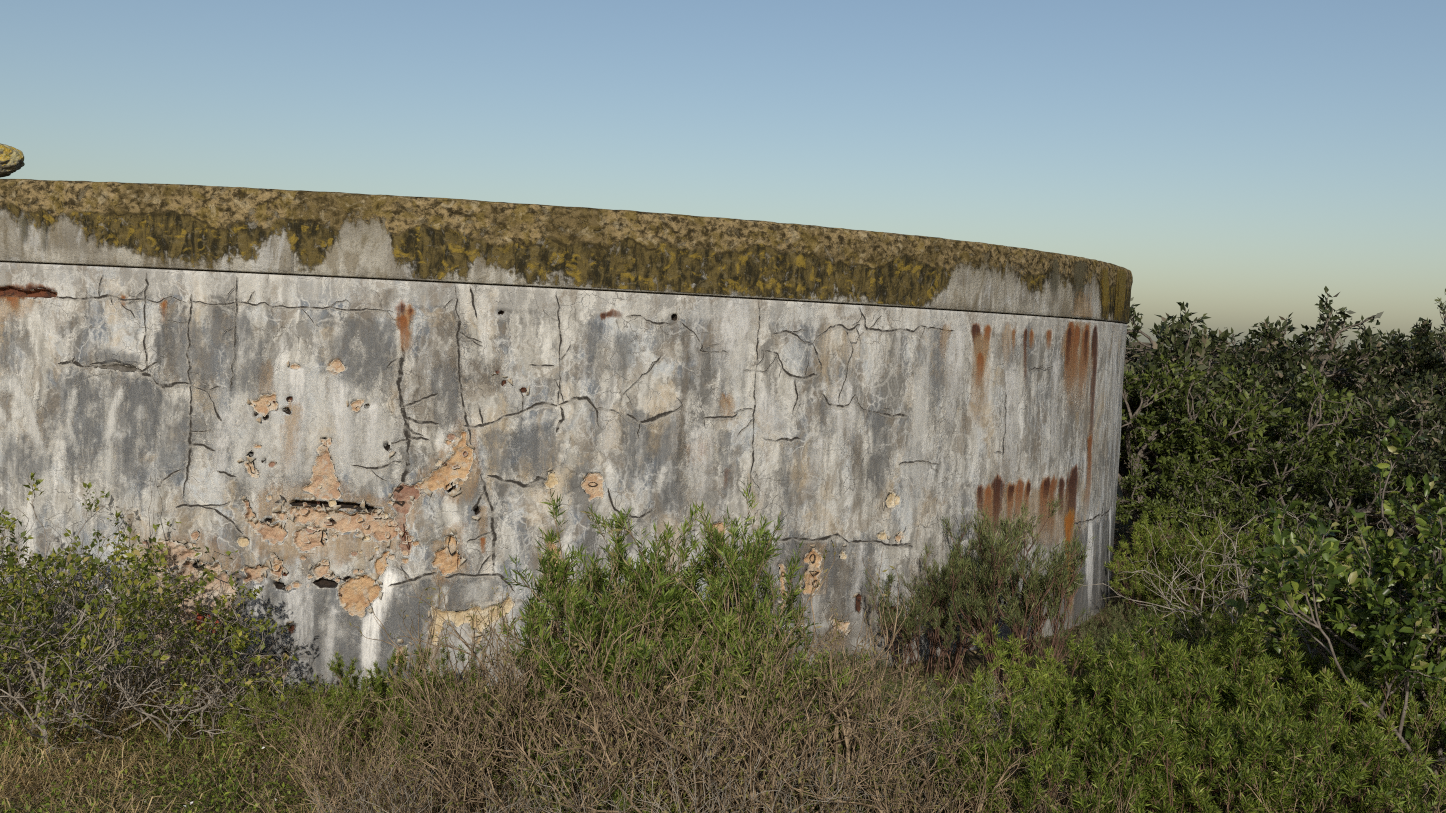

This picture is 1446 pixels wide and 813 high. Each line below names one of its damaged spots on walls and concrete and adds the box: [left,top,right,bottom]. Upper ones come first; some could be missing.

corrosion [0,283,57,308]
water stain [0,351,193,496]
spalling [246,392,292,426]
water stain [158,316,395,486]
corrosion [387,299,415,345]
crack [57,272,954,592]
corrosion [972,322,992,378]
corrosion [977,322,1098,602]
spalling [137,431,474,689]
water stain [227,569,425,692]
flaking render [428,528,515,659]
water stain [1074,502,1116,619]